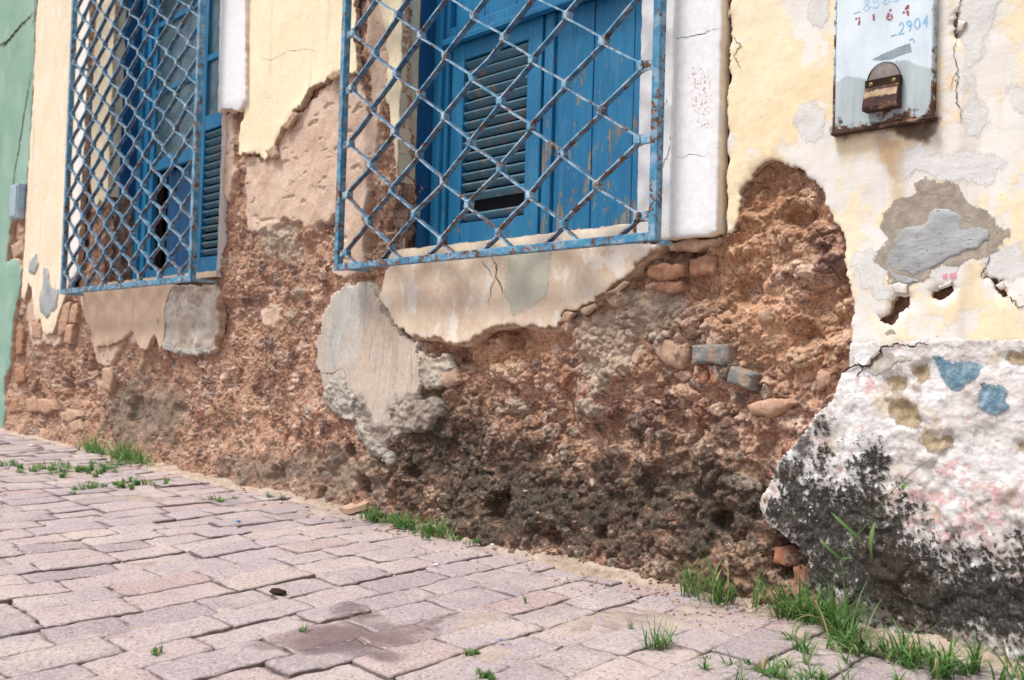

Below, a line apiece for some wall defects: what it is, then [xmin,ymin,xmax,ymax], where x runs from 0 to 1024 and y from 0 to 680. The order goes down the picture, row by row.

spalling [343,0,424,263]
crack [950,43,962,123]
spalling [0,69,855,615]
crack [483,257,503,303]
crack [846,342,929,377]
peeling [850,141,1024,325]
leakage [216,359,1024,661]